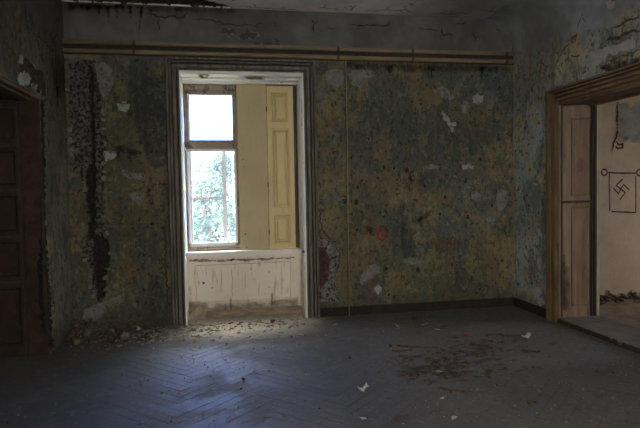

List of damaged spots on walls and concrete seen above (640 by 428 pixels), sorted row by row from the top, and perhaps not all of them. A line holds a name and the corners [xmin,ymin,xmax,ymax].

crack [311,5,479,41]
peeling [580,35,635,80]
peeling [442,111,456,132]
crack [611,102,625,152]
spalling [17,53,57,348]
spalling [65,60,117,322]
peeling [359,264,388,294]